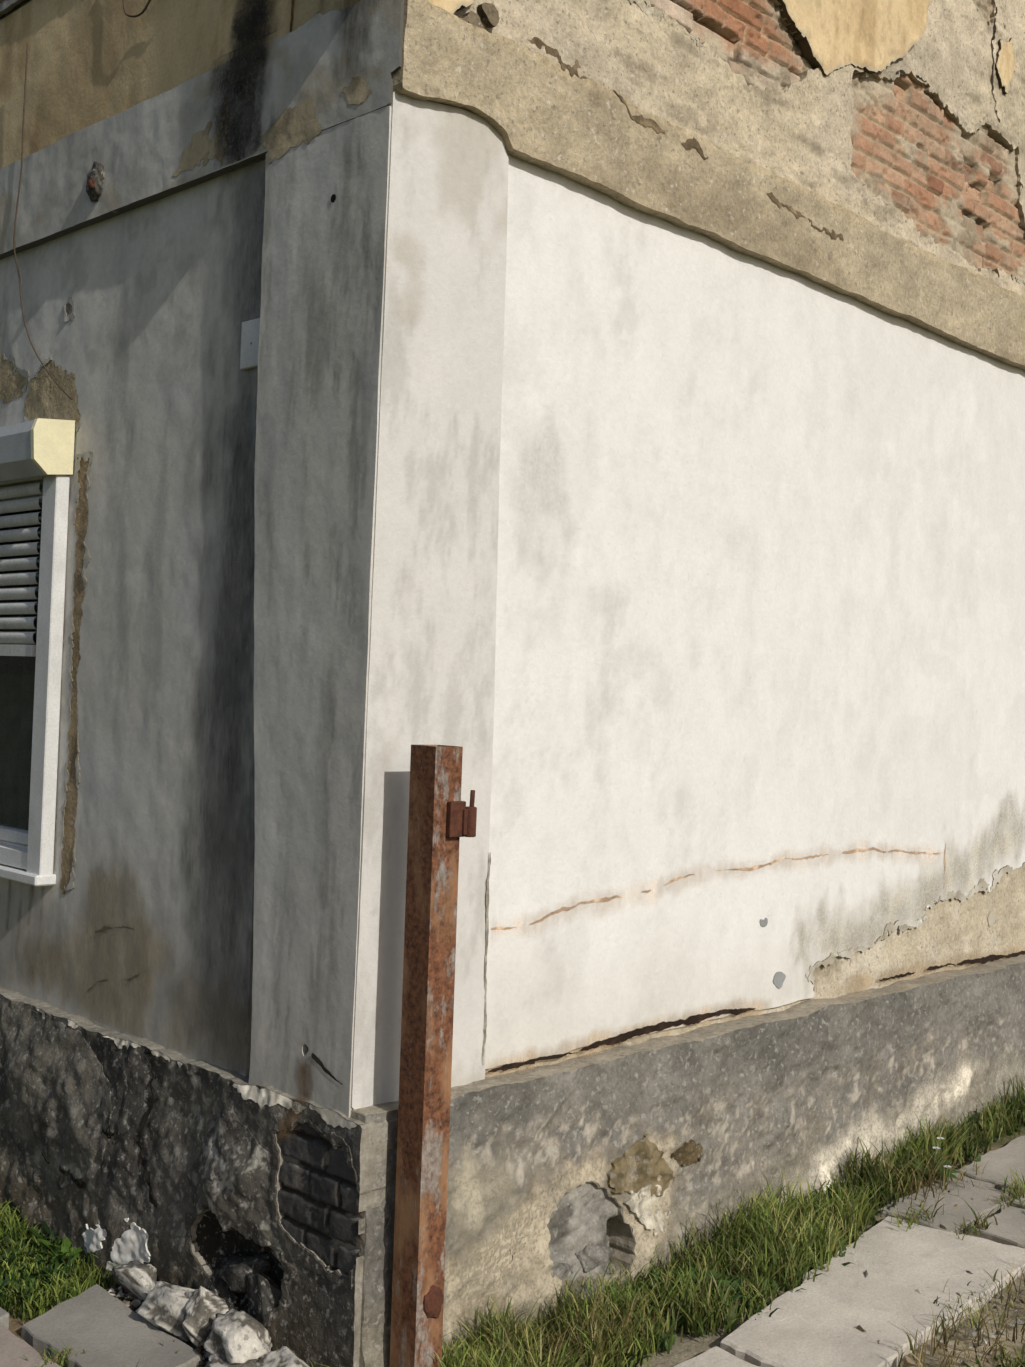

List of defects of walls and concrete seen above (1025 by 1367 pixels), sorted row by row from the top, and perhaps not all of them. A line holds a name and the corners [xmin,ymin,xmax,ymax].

flaking render [428,0,499,29]
spalling [527,37,587,79]
spalling [613,90,666,133]
flaking render [628,0,1025,285]
peeling [0,353,81,432]
peeling [60,451,94,895]
leakage [186,370,257,1056]
crack [482,847,946,1065]
crack [101,1051,158,1208]
flaking render [185,1083,361,1327]
rust [423,1285,444,1318]
spalling [443,1133,704,1342]